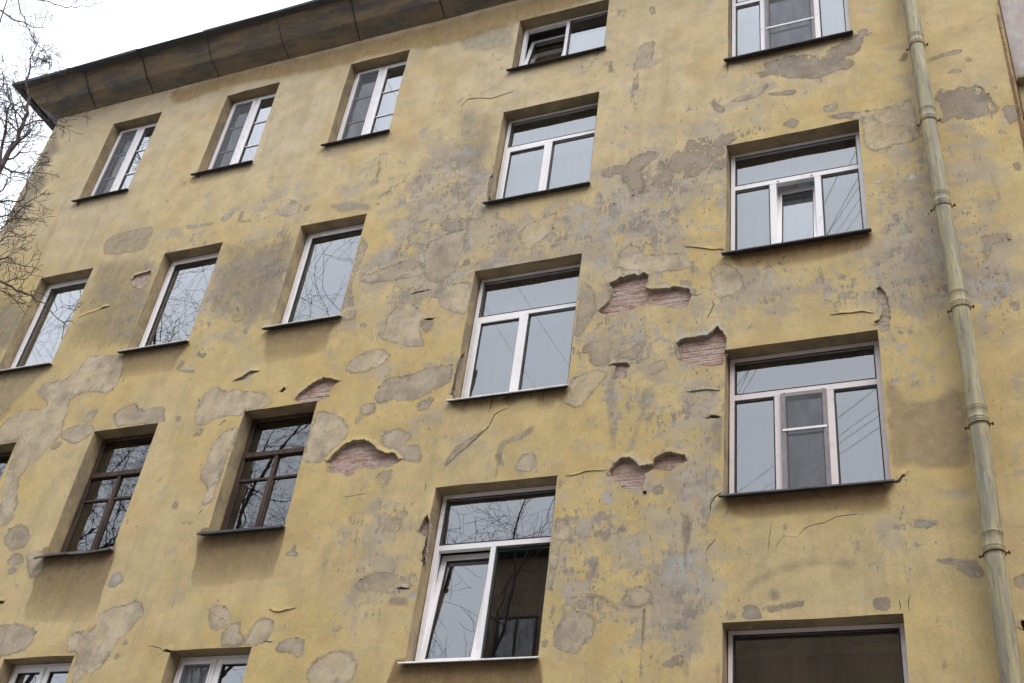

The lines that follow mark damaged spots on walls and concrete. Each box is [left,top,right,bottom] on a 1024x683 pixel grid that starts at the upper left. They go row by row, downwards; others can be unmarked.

peeling [711,29,873,113]
peeling [935,84,1021,123]
peeling [600,126,761,203]
flaking render [564,245,694,408]
flaking render [647,321,729,374]
flaking render [195,281,472,506]
peeling [0,354,124,578]
crack [425,398,511,490]
flaking render [605,446,689,495]
crack [768,514,855,548]